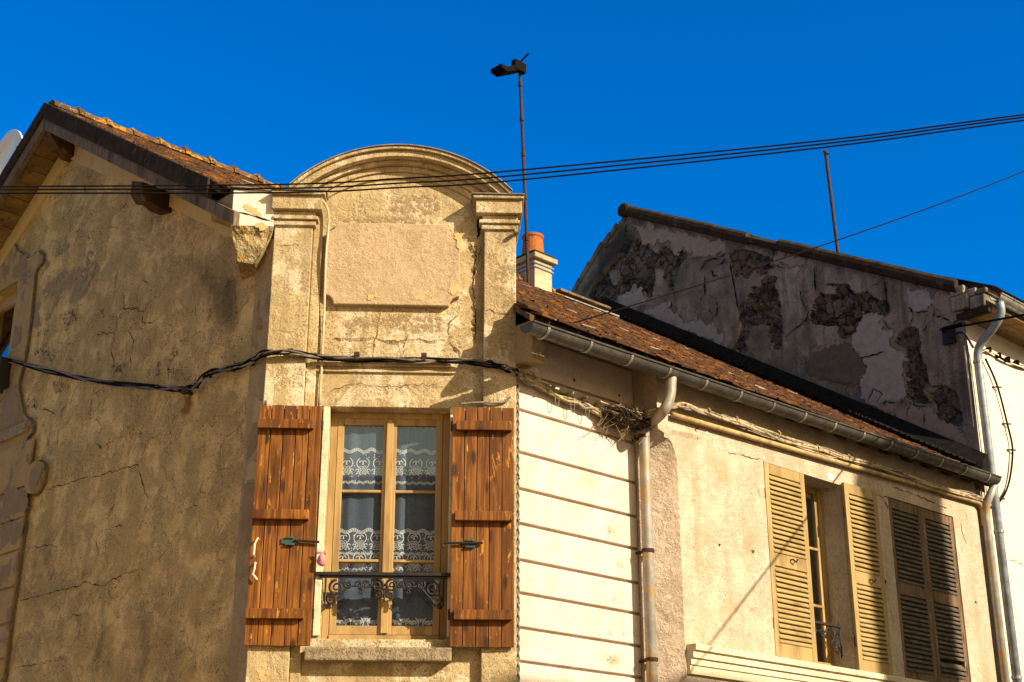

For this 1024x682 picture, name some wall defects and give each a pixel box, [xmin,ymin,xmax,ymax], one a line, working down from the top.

crack [35,272,164,444]
crack [328,220,514,402]
spalling [587,239,687,302]
crack [669,254,738,317]
spalling [729,249,783,353]
spalling [804,283,890,385]
spalling [895,327,963,427]
crack [20,417,158,635]